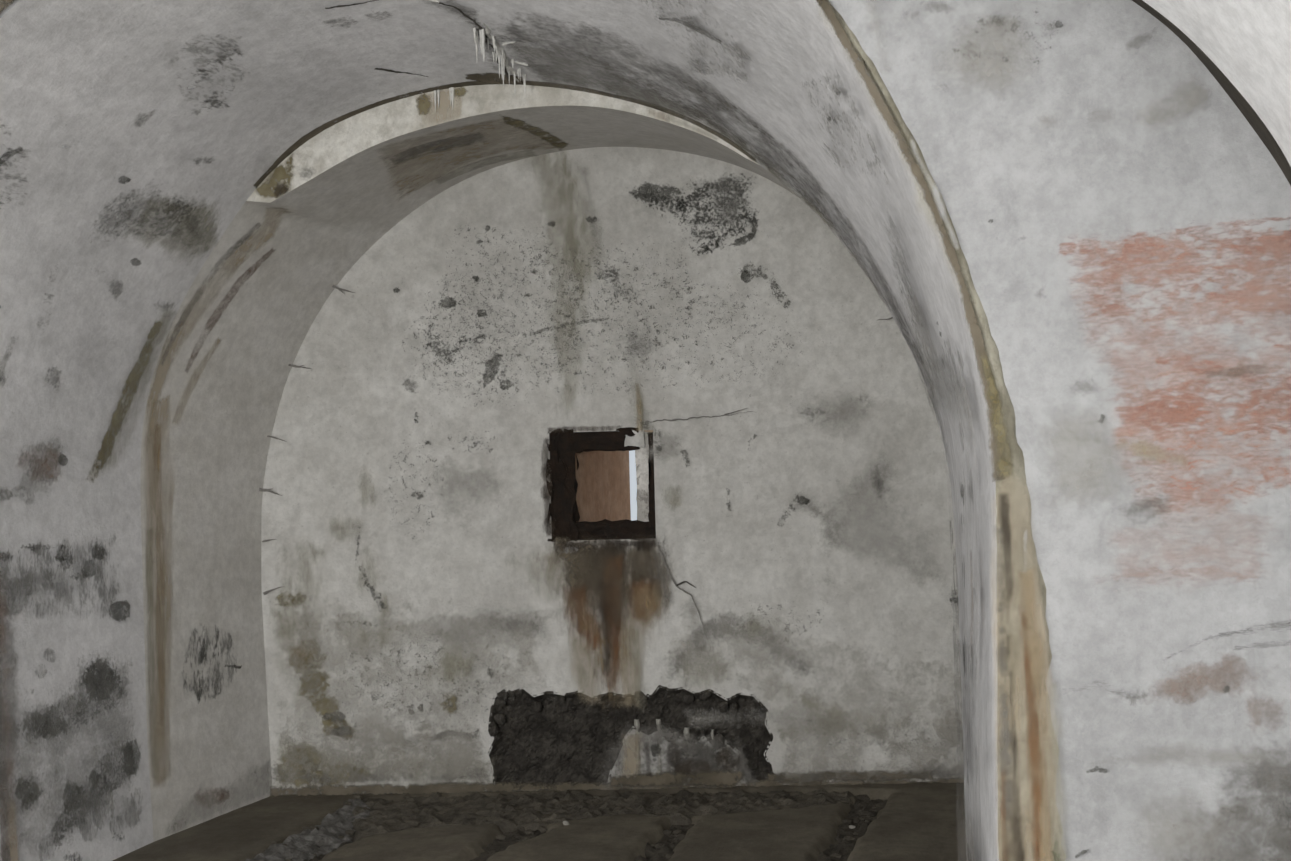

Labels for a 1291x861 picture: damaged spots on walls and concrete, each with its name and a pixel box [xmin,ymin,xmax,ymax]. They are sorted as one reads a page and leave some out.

crack [325,0,377,9]
crack [374,68,428,77]
crack [437,2,509,79]
water stain [396,1,853,233]
water stain [100,176,210,236]
water stain [418,174,794,398]
corrosion [554,538,668,694]
water stain [0,540,141,861]
water stain [270,631,978,797]